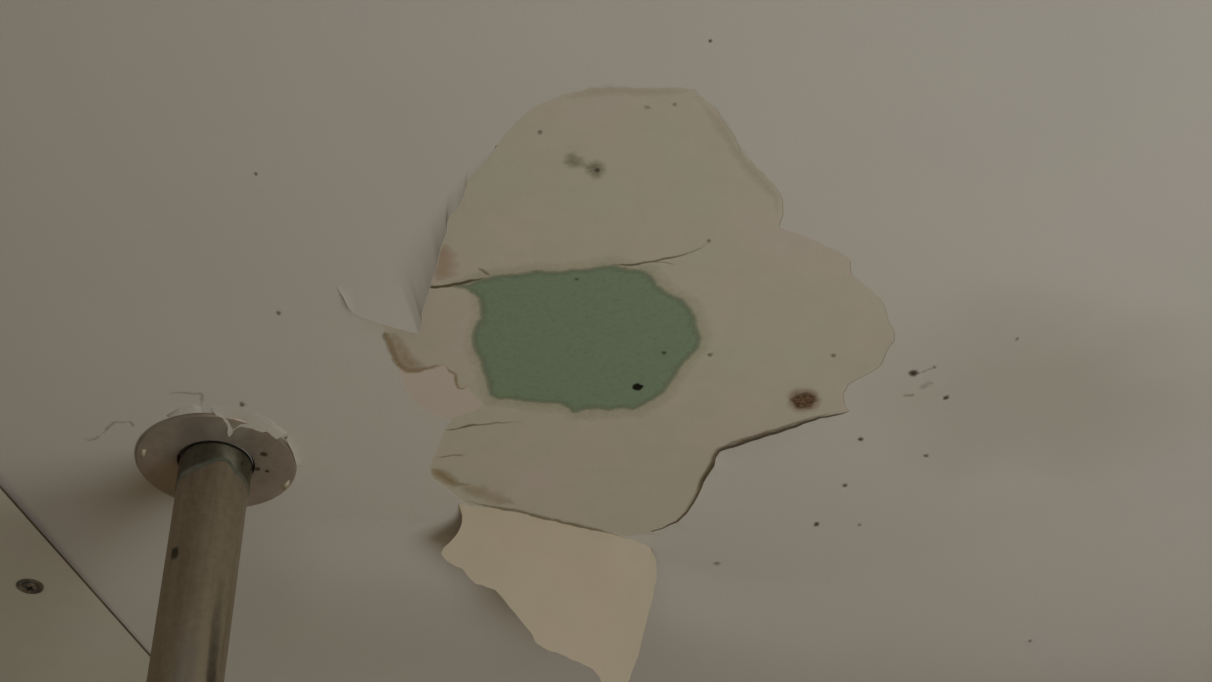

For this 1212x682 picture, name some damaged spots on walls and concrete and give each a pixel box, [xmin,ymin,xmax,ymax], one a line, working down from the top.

peeling [336,87,895,682]